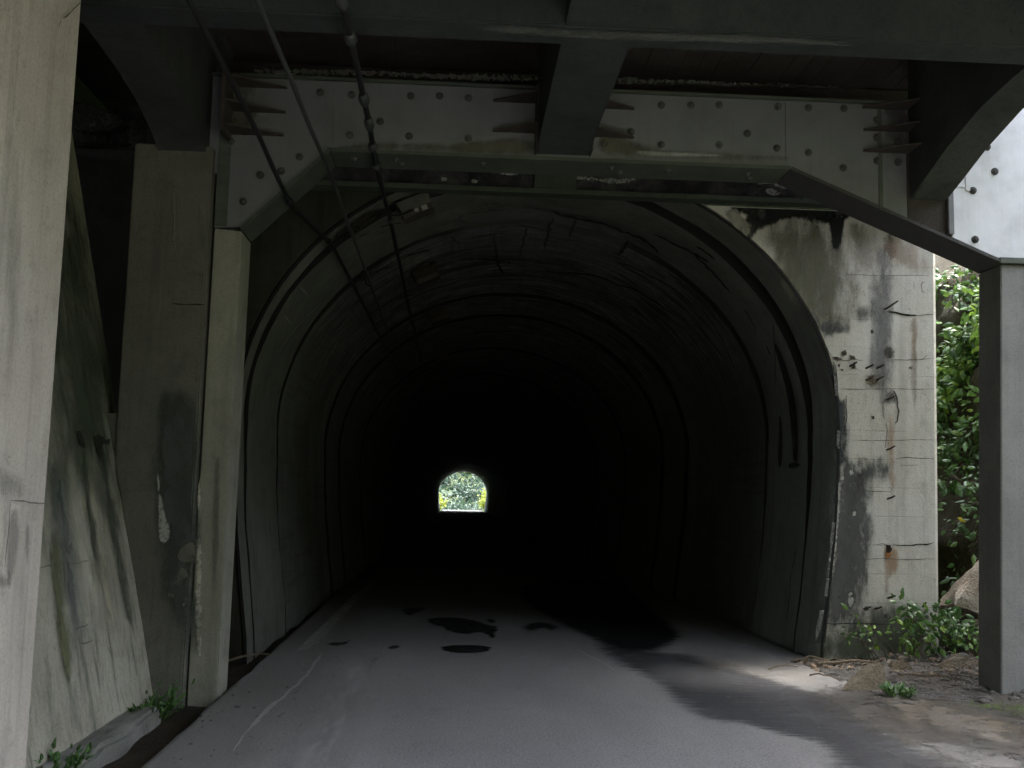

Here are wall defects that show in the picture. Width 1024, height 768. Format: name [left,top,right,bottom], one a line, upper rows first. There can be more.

crack [543,211,730,295]
damp [726,207,849,249]
damp [821,322,849,335]
spalling [822,340,856,396]
damp [858,234,897,403]
damp [51,449,133,639]
damp [157,394,219,657]
damp [818,398,929,660]
spalling [815,610,824,643]